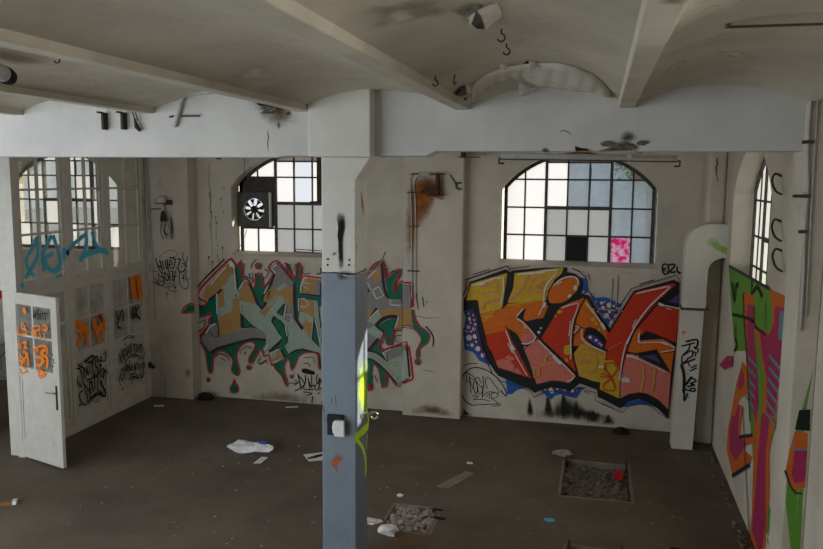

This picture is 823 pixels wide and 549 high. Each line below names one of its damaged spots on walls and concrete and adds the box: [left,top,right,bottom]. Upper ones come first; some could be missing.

crack [726,21,823,29]
rust [408,178,443,247]